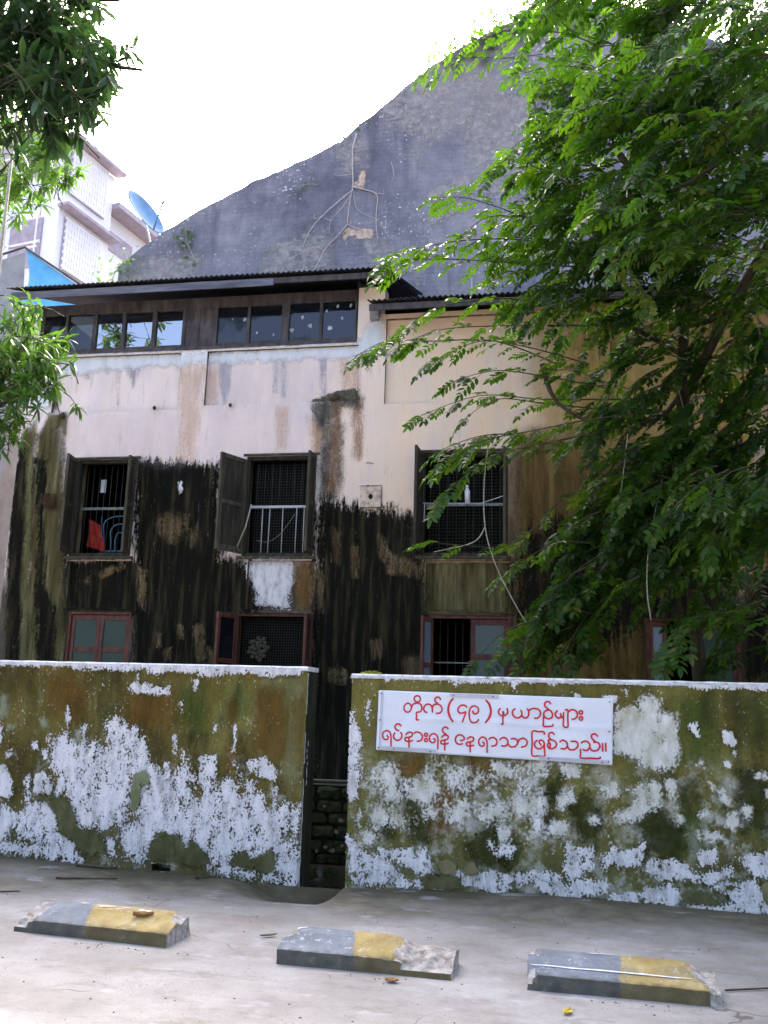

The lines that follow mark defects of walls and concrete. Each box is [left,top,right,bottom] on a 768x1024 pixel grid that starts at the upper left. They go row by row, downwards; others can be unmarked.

peeling [381,65,512,165]
peeling [336,137,368,190]
spalling [342,221,374,241]
leakage [5,422,263,690]
leakage [310,309,755,780]
peeling [0,705,309,886]
leakage [431,789,453,829]
leakage [465,822,521,871]
peeling [315,675,768,914]
leakage [537,772,564,831]
leakage [636,775,703,862]
leakage [734,767,768,835]